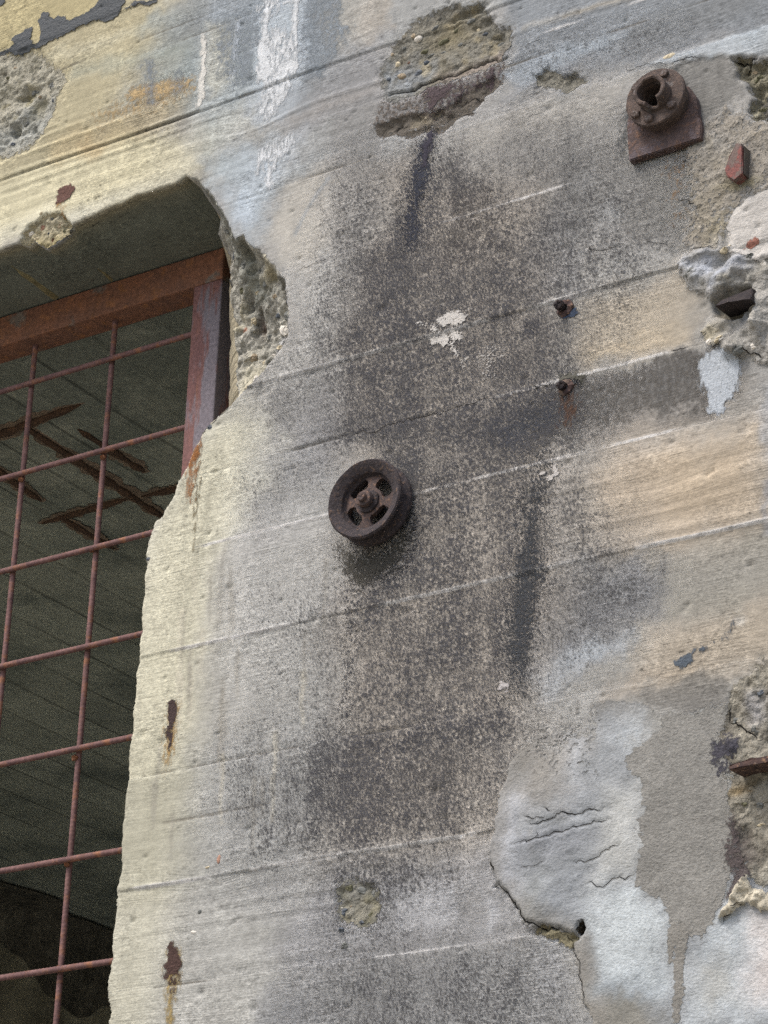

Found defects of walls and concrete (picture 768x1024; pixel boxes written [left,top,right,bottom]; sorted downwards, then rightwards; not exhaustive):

spalling [0,52,68,159]
water stain [195,0,349,122]
spalling [373,0,513,139]
spalling [191,177,289,434]
water stain [211,119,741,1024]
corrosion [164,699,179,762]
corrosion [163,941,182,1024]
spalling [336,877,382,949]
crack [490,861,586,1006]
crack [515,807,611,867]
crack [577,845,632,888]
spalling [718,657,768,918]